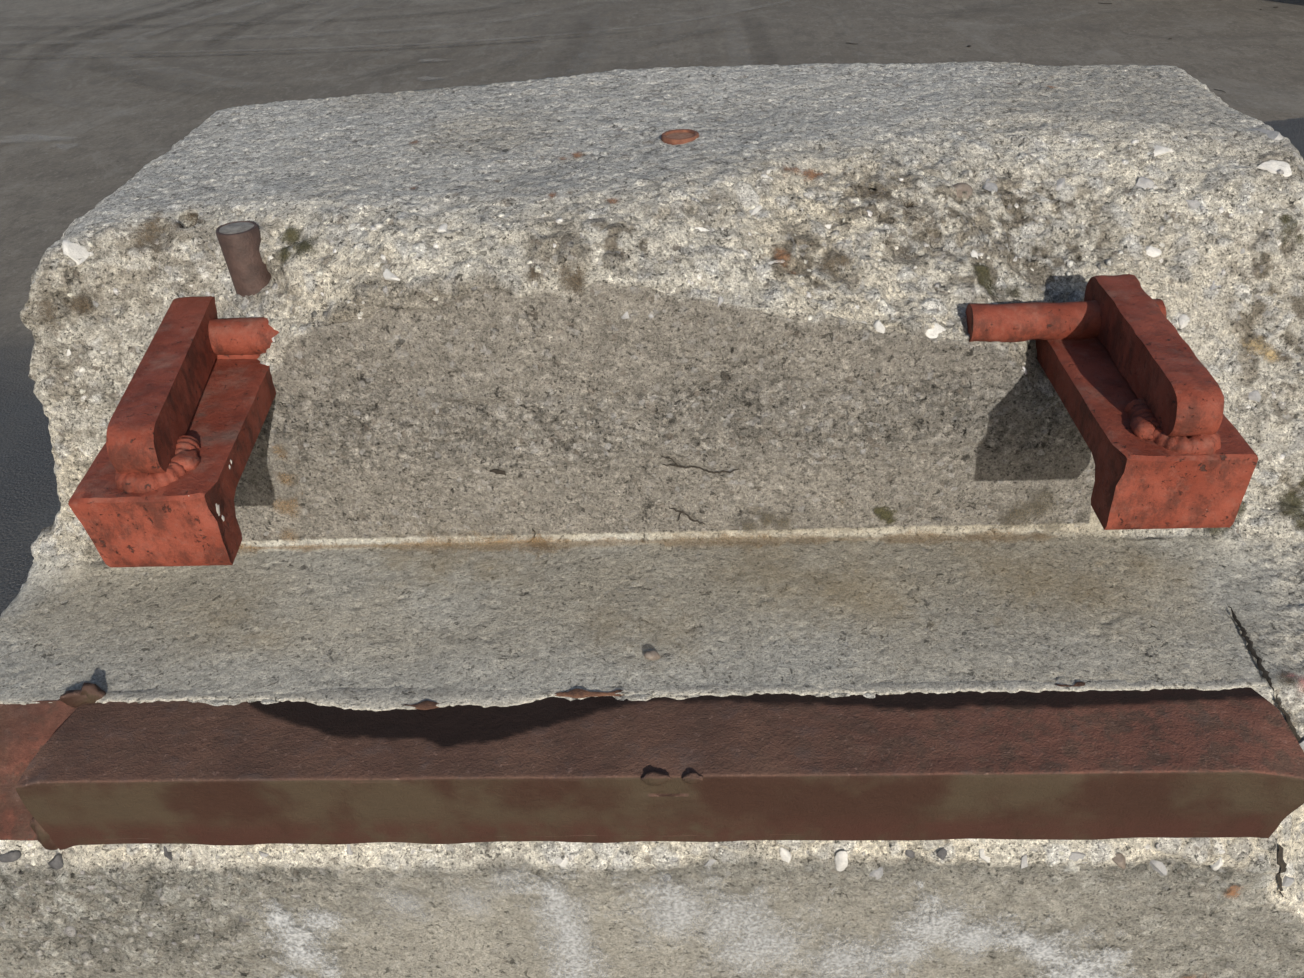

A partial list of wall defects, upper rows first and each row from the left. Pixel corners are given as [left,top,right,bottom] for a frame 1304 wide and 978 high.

rust [404,700,439,710]
rust [554,689,624,698]
crack [1228,606,1301,741]
crack [1276,844,1287,897]